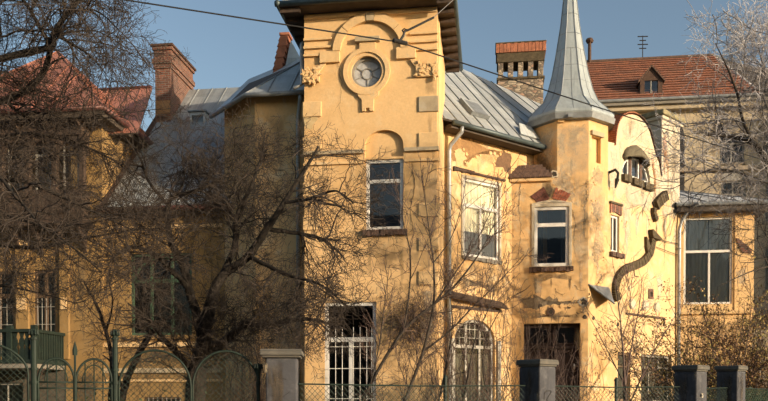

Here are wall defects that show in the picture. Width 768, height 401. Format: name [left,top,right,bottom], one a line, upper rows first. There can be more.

flaking render [451,137,512,174]
flaking render [531,152,620,233]
flaking render [622,171,678,241]
spalling [531,295,595,320]